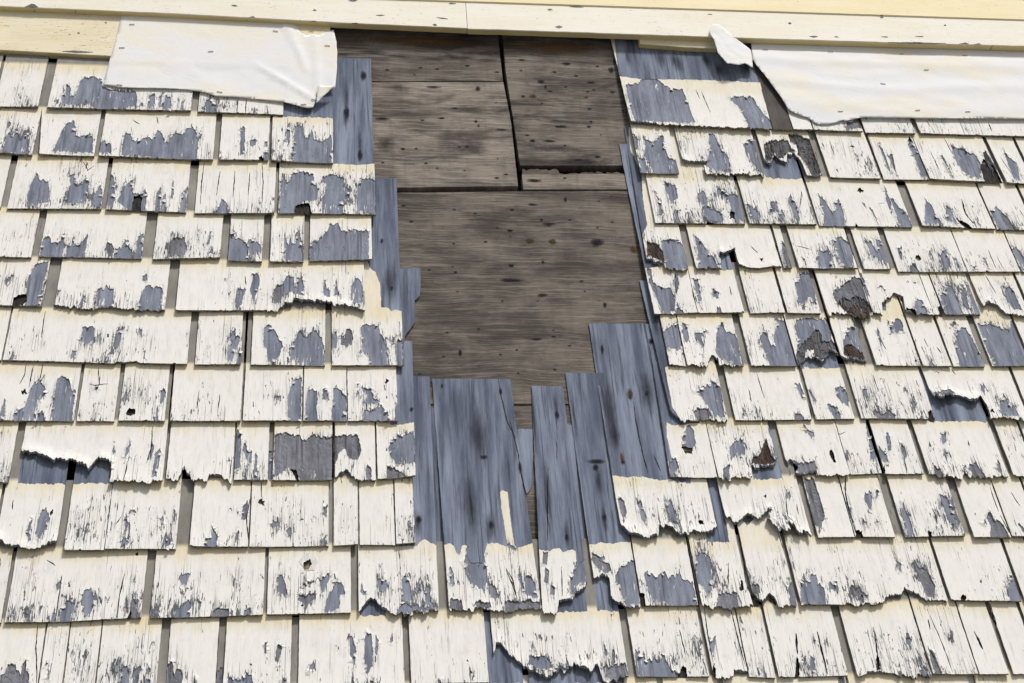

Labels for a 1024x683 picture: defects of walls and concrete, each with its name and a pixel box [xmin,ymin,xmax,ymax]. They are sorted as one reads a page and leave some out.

peeling [53,120,203,213]
peeling [240,124,376,262]
peeling [626,79,737,223]
peeling [228,232,261,364]
peeling [646,236,744,367]
peeling [698,188,929,366]
peeling [0,376,76,421]
peeling [263,323,403,421]
crack [498,380,548,539]
spalling [866,420,891,474]
crack [506,569,517,598]
peeling [558,550,716,617]